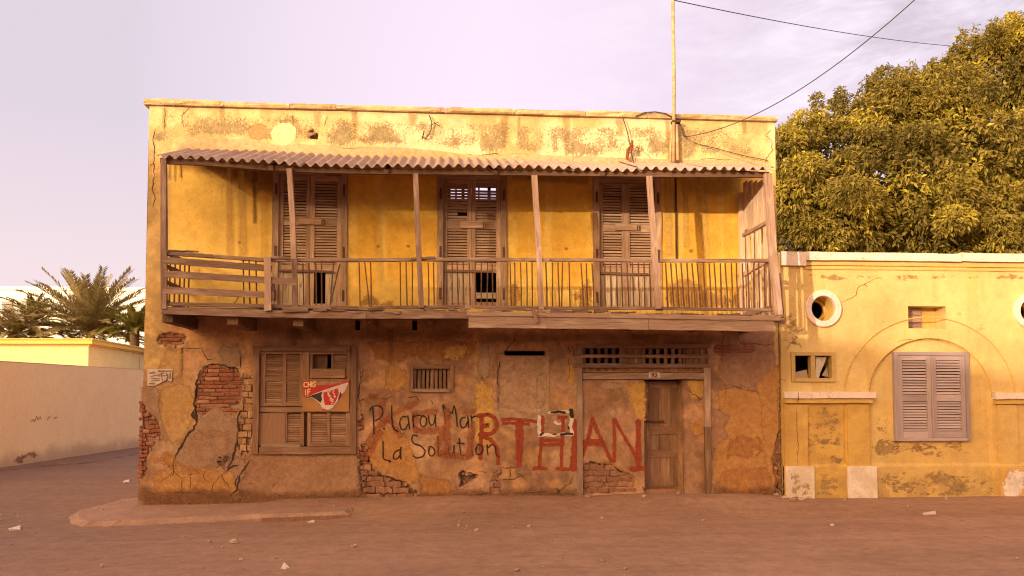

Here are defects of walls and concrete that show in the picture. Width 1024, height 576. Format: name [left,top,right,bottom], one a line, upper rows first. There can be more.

crack [150,107,187,205]
crack [159,348,281,496]
peeling [136,331,477,503]
flaking render [583,461,638,494]
peeling [712,331,842,496]
peeling [881,469,1024,496]